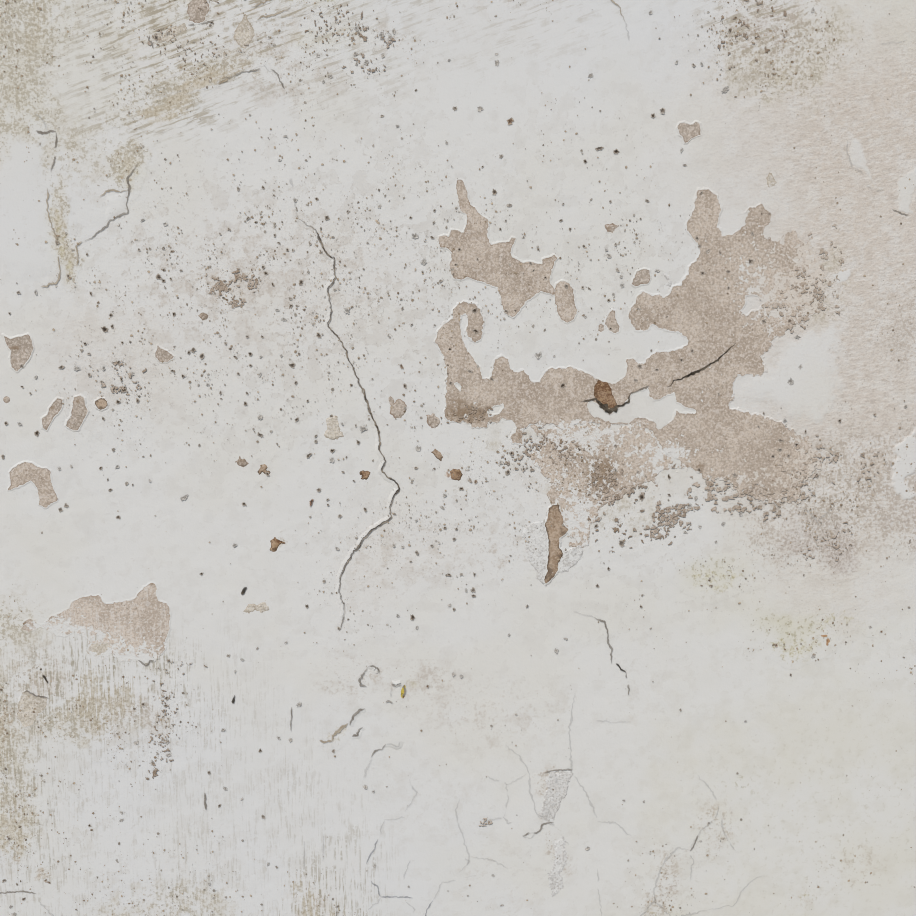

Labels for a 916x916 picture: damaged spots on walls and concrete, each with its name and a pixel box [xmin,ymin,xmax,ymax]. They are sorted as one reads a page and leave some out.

peeling [1,332,35,374]
peeling [34,342,147,436]
peeling [153,343,185,378]
crack [294,217,400,626]
peeling [426,178,853,587]
peeling [7,460,72,512]
peeling [15,581,191,780]